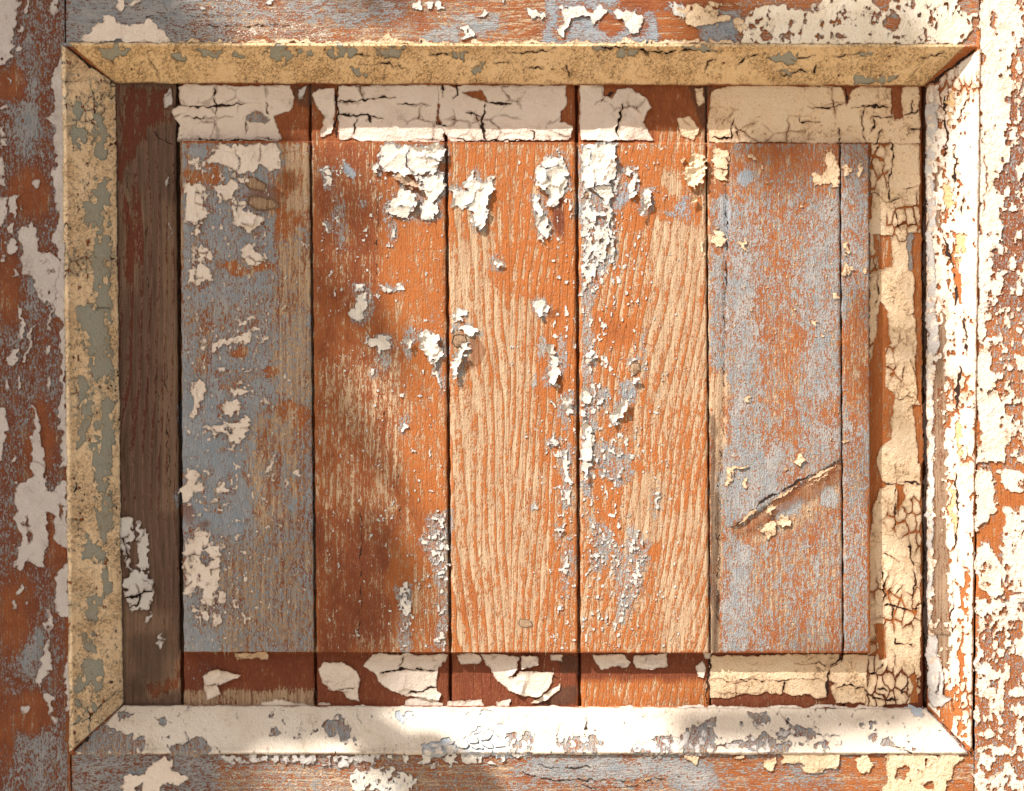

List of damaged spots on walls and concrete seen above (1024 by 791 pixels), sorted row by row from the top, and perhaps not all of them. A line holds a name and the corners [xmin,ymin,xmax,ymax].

peeling [0,0,29,66]
peeling [49,0,58,16]
crack [333,85,535,142]
crack [495,47,570,74]
crack [601,46,863,77]
peeling [0,54,150,724]
peeling [79,0,680,670]
peeling [442,0,1024,791]
crack [705,49,975,754]
peeling [77,510,560,791]